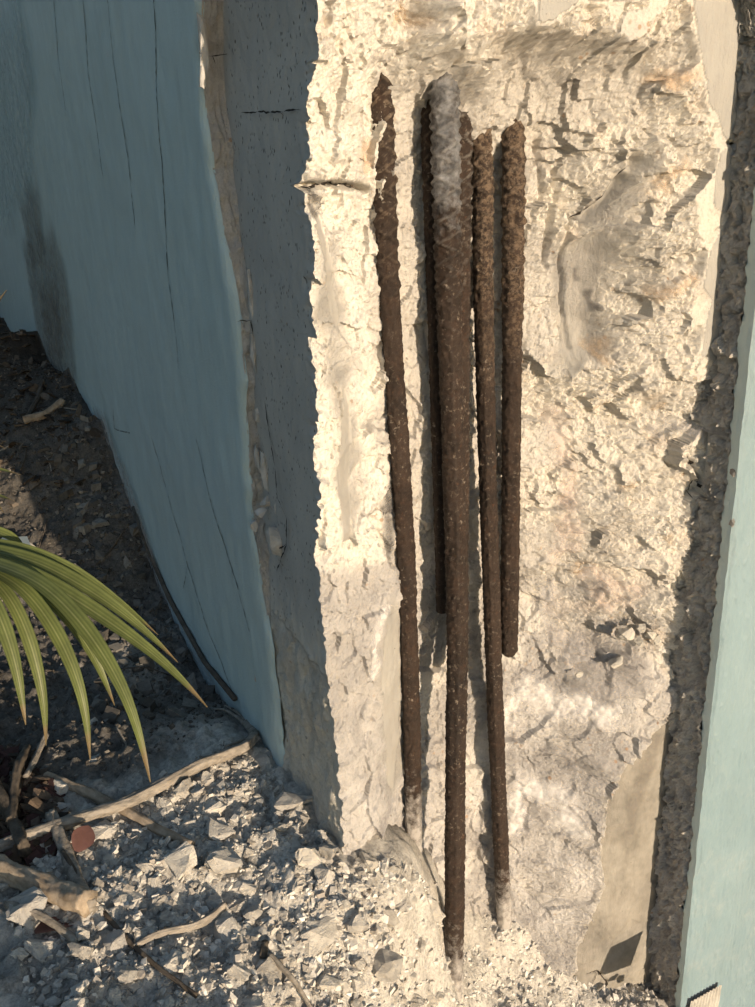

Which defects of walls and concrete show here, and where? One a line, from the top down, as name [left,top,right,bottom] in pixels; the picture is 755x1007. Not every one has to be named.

crack [301,181,354,196]
spalling [197,0,755,1007]